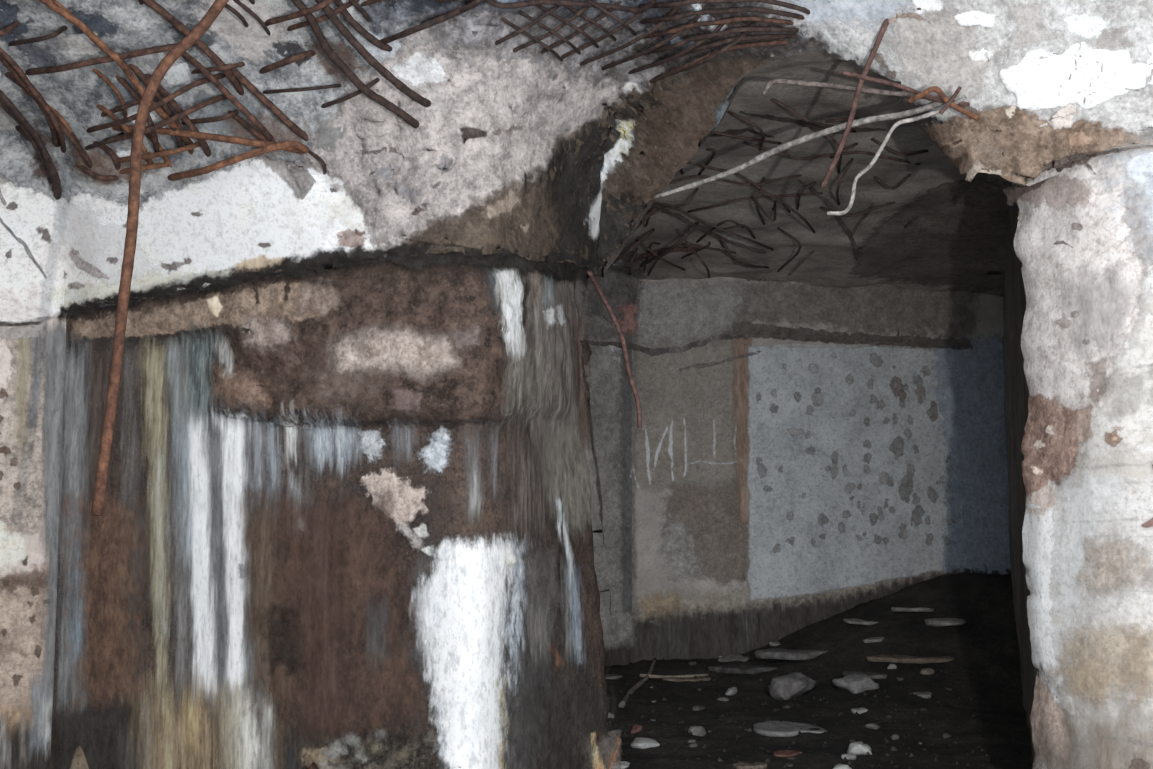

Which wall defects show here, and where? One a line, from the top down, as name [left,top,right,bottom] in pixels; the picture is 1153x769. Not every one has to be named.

rust [312,39,369,83]
rust [33,123,57,190]
rust [70,140,149,184]
rust [226,114,301,152]
spalling [0,0,650,570]
damp [358,0,1011,769]
peeling [747,0,1153,769]
damp [0,320,450,769]
crack [1142,518,1153,527]
spalling [28,587,49,623]
damp [1048,622,1153,708]
damp [1033,721,1153,769]